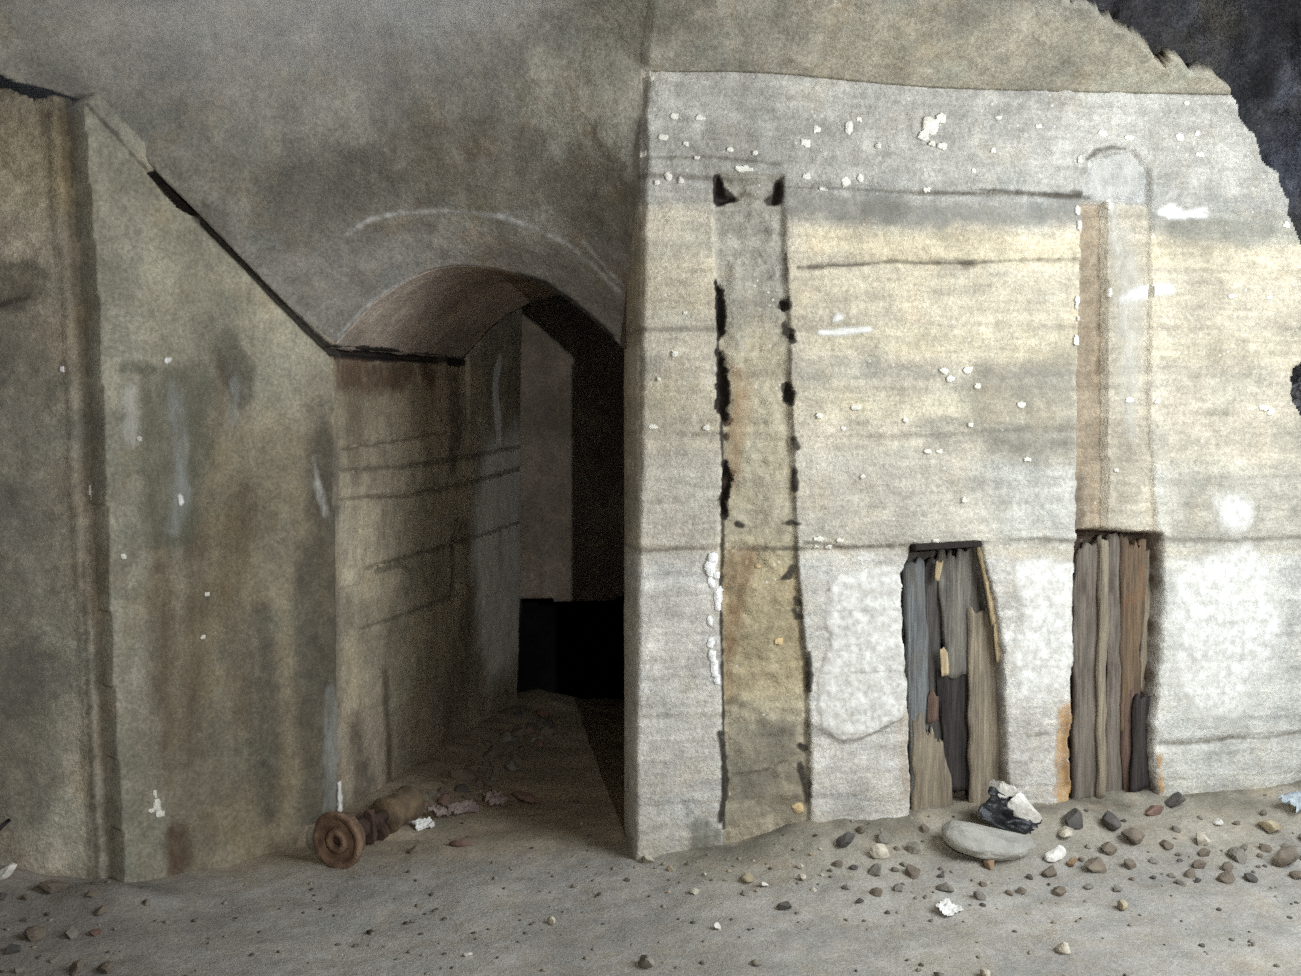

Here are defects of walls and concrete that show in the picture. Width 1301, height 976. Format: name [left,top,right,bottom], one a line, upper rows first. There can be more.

damp [148,790,165,818]
crack [714,279,745,829]
crack [779,254,892,813]
corrosion [1058,707,1072,802]